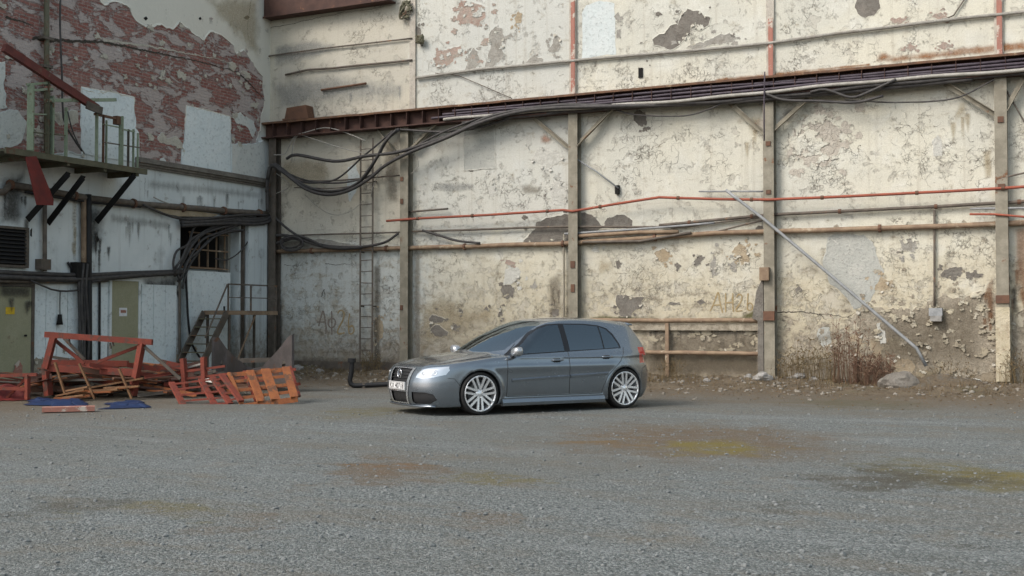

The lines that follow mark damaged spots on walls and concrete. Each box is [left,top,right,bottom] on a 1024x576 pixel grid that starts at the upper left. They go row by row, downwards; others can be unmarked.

flaking render [416,0,522,74]
flaking render [640,6,746,51]
flaking render [0,0,265,171]
peeling [483,258,538,322]
flaking render [581,211,633,252]
flaking render [613,294,645,318]
flaking render [652,237,761,285]
crack [716,242,854,320]
flaking render [777,234,996,380]